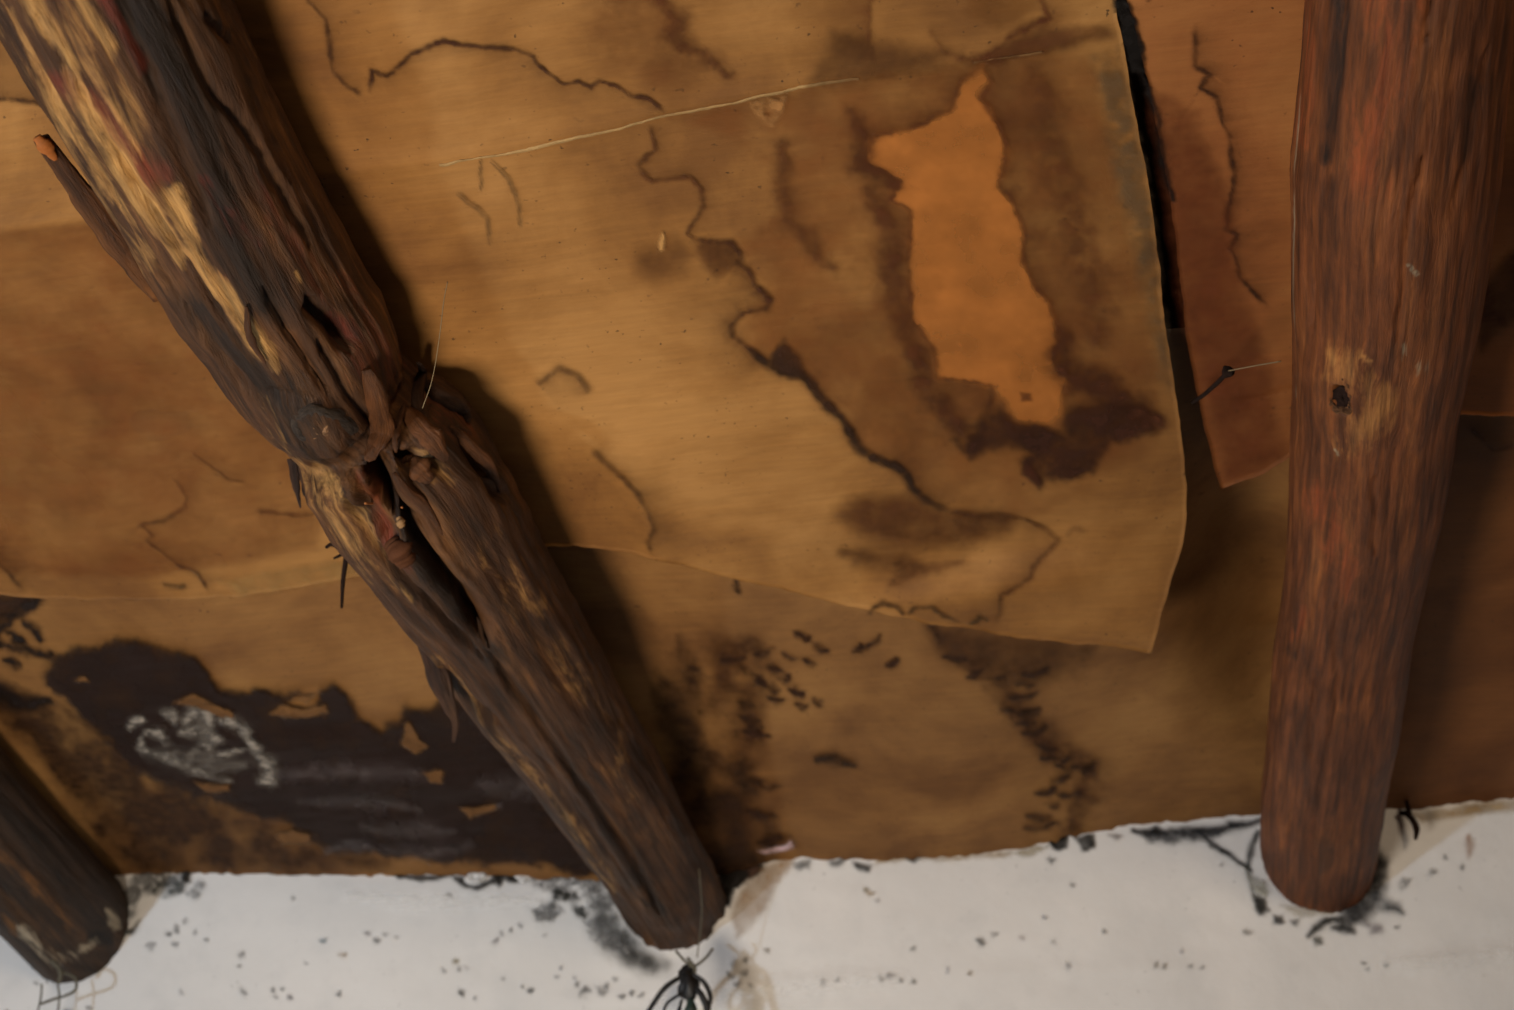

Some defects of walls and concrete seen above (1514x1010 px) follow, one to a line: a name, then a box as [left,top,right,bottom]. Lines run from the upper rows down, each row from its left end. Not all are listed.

leakage [338,39,660,110]
leakage [654,0,728,78]
leakage [641,130,1006,540]
leakage [852,4,1164,486]
leakage [660,631,829,875]
leakage [814,755,856,768]
leakage [872,519,1097,835]
mould [124,871,203,936]